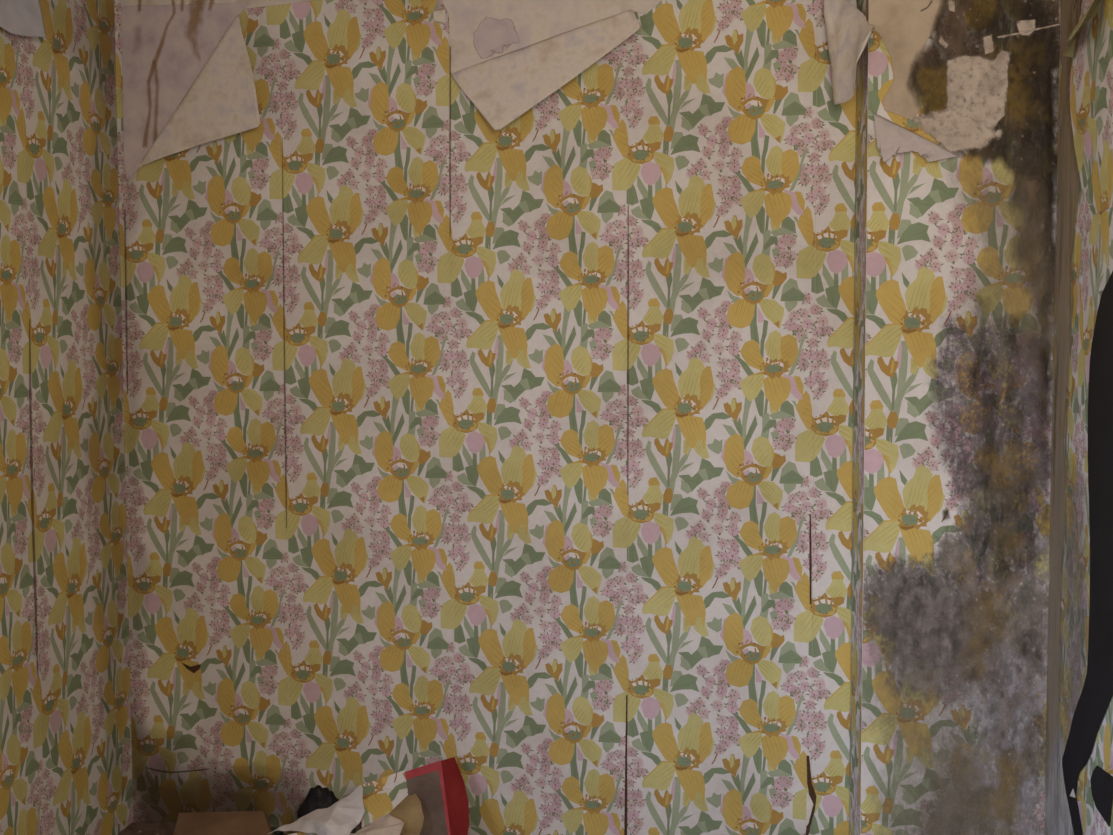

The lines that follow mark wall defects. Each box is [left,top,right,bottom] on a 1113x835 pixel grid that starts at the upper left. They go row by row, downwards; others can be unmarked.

flaking render [121,0,313,180]
flaking render [856,0,1061,153]
water stain [863,0,1086,835]